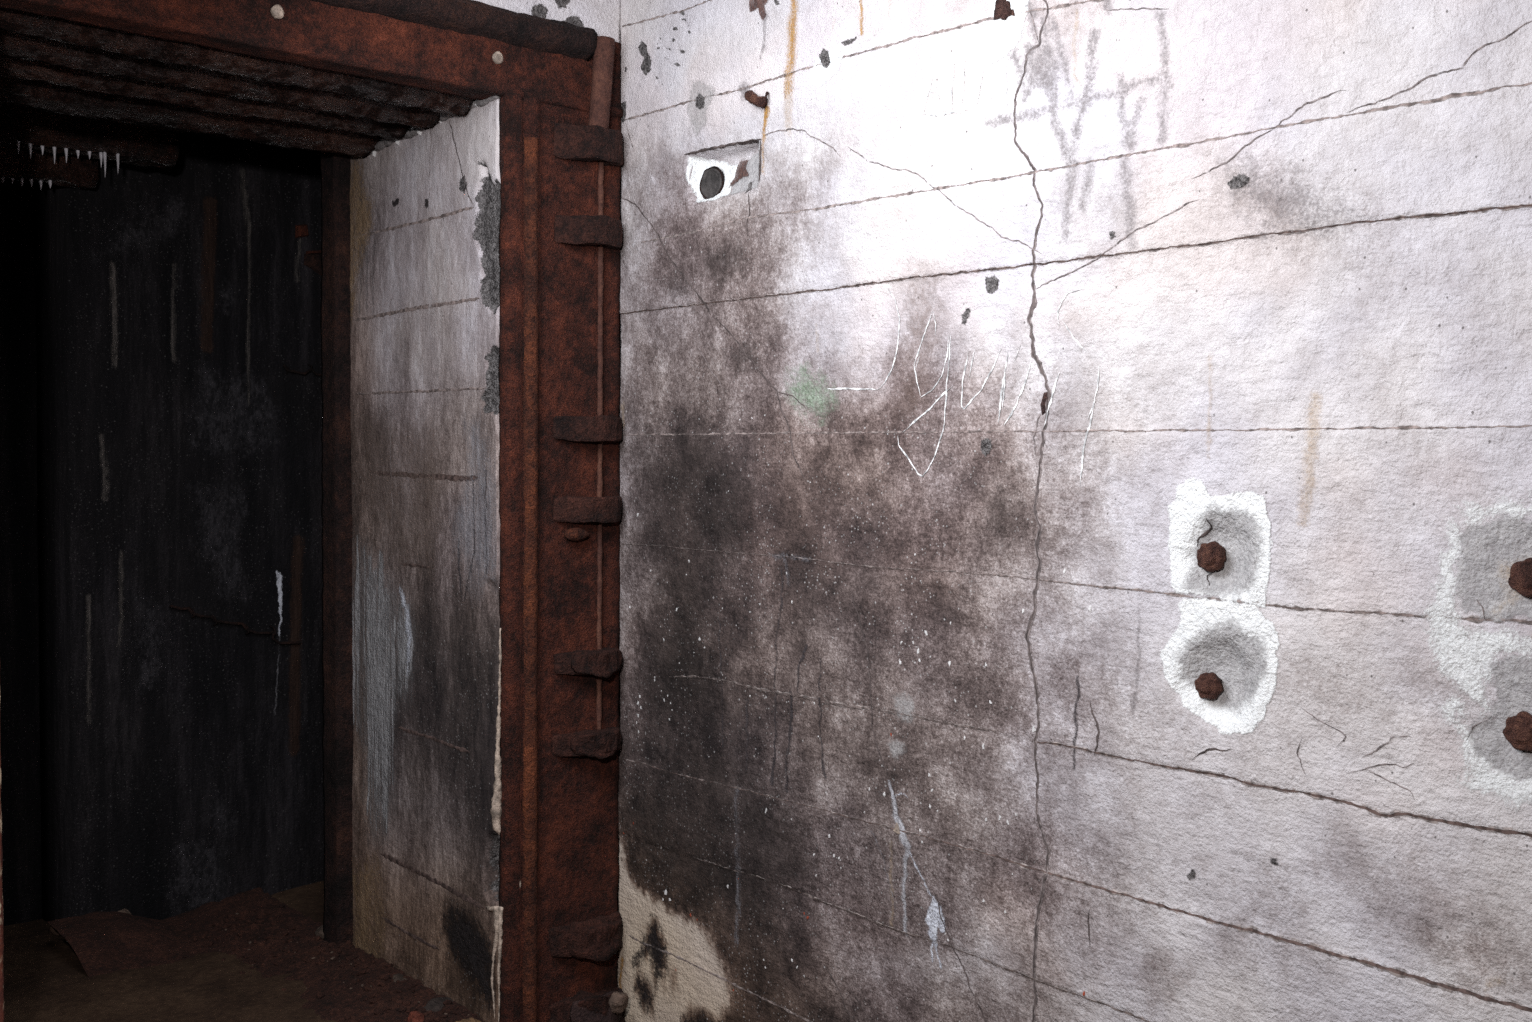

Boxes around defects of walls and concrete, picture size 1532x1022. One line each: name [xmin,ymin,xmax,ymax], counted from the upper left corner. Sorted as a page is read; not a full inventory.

rust [749,0,796,92]
crack [621,197,807,481]
water stain [770,565,826,792]
water stain [1072,676,1080,768]
crack [764,0,1532,1022]
spalling [1160,478,1280,735]
water stain [888,780,945,968]
rust [570,958,625,1022]